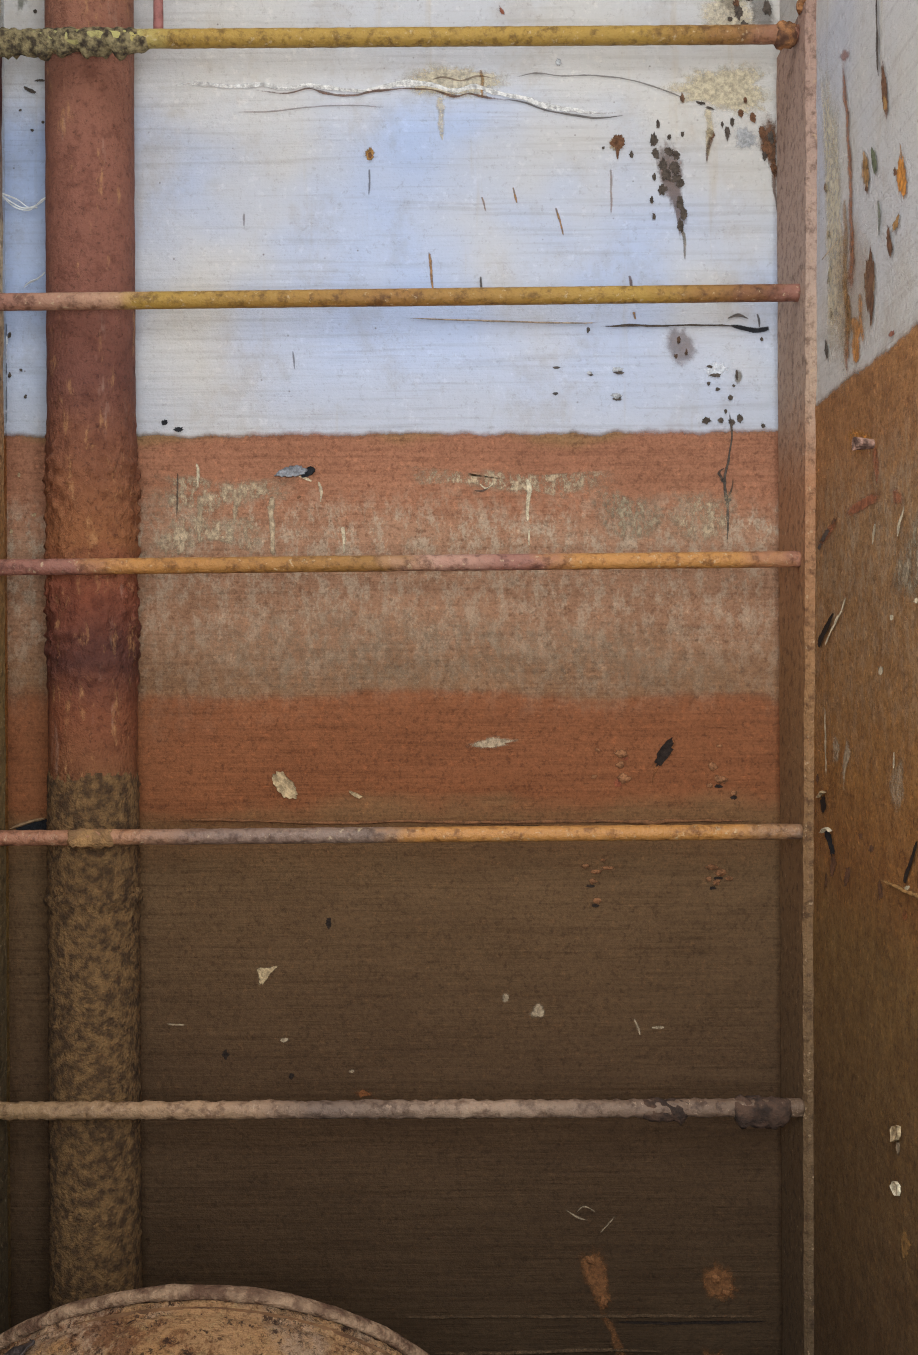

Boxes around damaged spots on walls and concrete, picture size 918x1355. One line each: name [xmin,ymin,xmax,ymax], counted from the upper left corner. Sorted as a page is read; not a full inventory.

rust [842,71,864,370]
rust [893,144,907,199]
leakage [4,434,46,559]
leakage [137,363,779,558]
leakage [4,575,48,830]
leakage [137,568,781,1102]
leakage [6,845,49,1102]
leakage [7,1120,50,1329]
leakage [141,1116,783,1355]
rust [581,1253,624,1355]
rust [703,1264,738,1300]